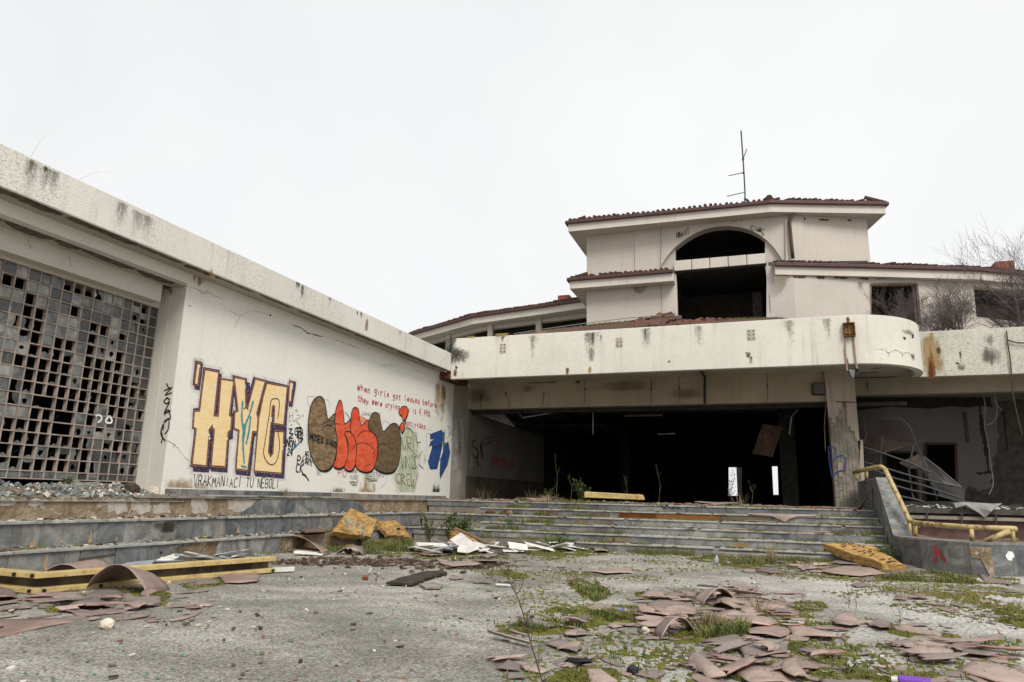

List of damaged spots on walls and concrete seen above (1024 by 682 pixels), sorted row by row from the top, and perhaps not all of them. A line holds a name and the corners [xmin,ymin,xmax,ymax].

leakage [445,338,467,362]
corrosion [911,333,942,378]